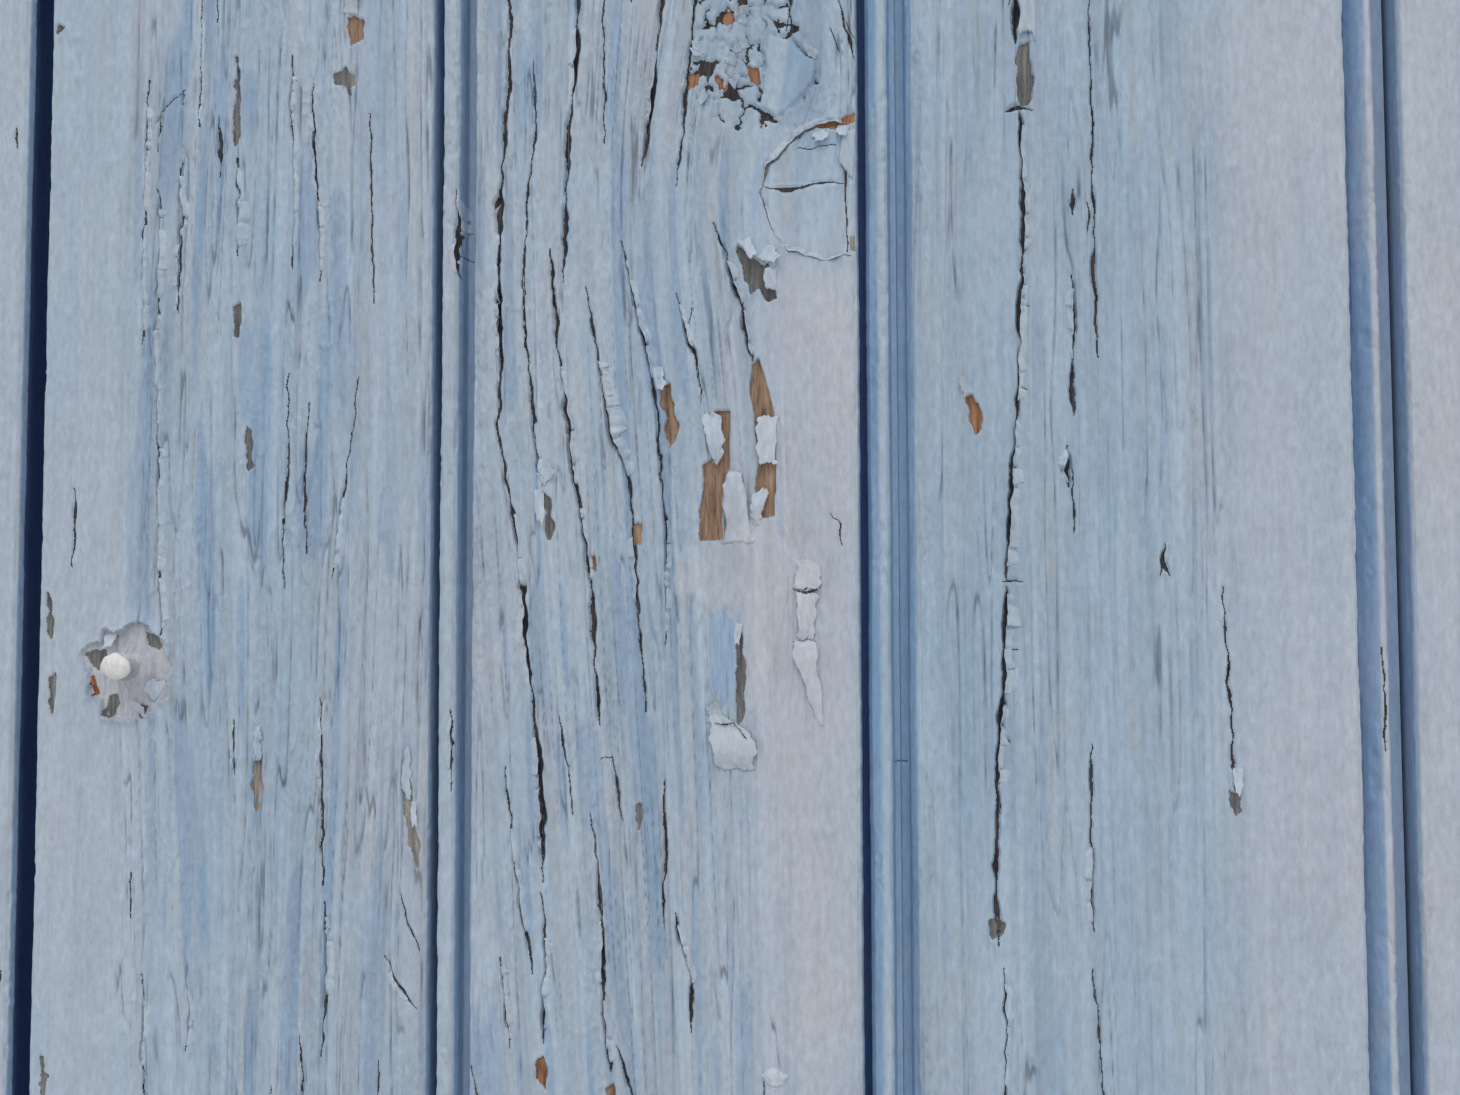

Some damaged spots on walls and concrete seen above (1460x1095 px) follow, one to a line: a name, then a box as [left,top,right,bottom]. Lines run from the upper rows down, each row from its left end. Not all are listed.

peeling [688,0,819,131]
crack [1008,0,1020,44]
peeling [763,115,856,179]
peeling [736,194,857,302]
crack [1058,0,1099,533]
peeling [699,358,779,544]
peeling [81,624,171,720]
crack [449,0,703,1095]
peeling [706,609,758,771]
crack [992,106,1033,1095]
crack [1084,744,1095,932]
crack [1092,970,1105,1095]